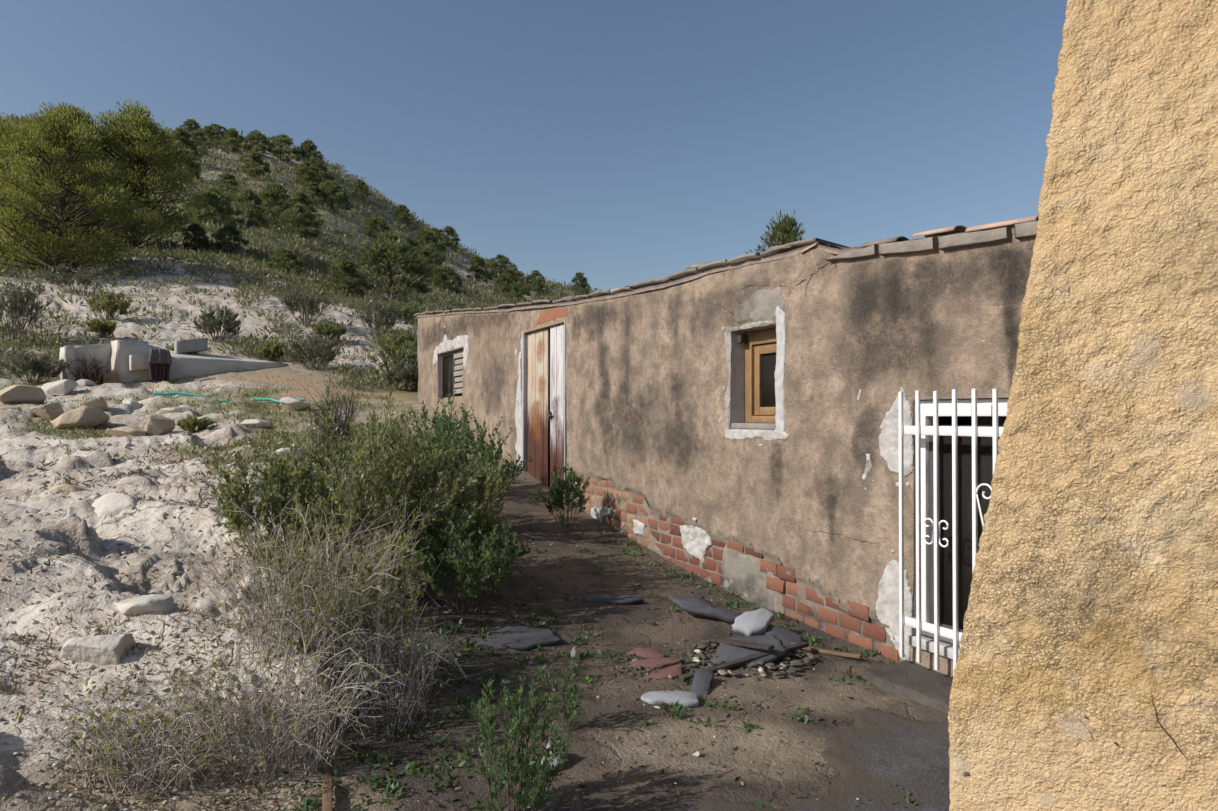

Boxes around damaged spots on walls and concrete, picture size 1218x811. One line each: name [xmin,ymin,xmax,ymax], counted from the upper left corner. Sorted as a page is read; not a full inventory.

water stain [852,248,1032,370]
flaking render [862,387,915,490]
flaking render [566,470,915,662]
crack [1145,699,1189,761]